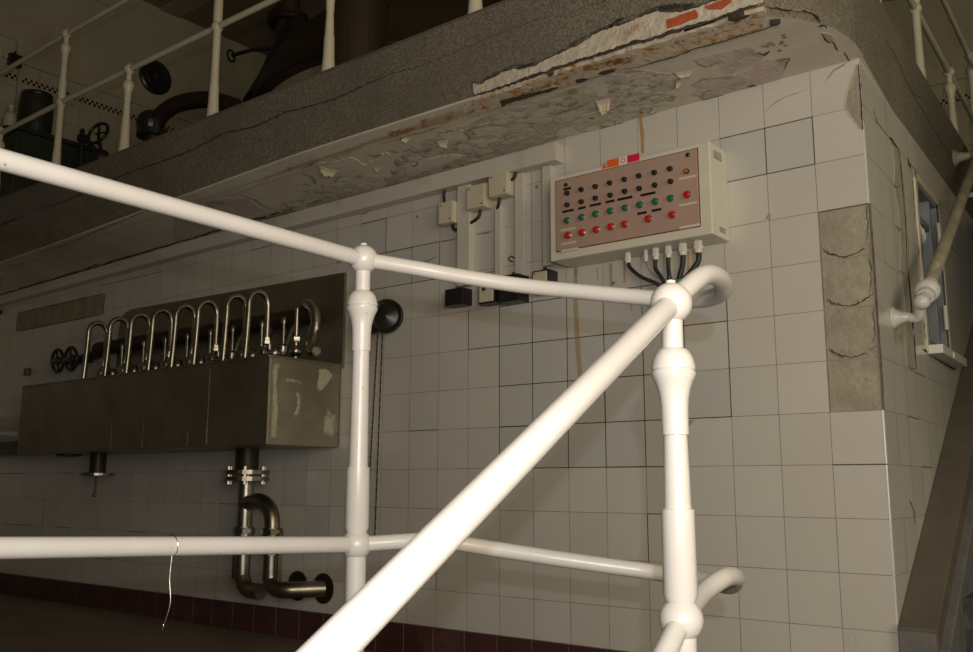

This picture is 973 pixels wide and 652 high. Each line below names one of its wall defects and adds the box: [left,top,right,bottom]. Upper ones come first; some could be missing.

crack [112,15,552,180]
peeling [198,34,790,221]
spalling [472,0,764,97]
rust [460,6,780,118]
peeling [172,218,217,241]